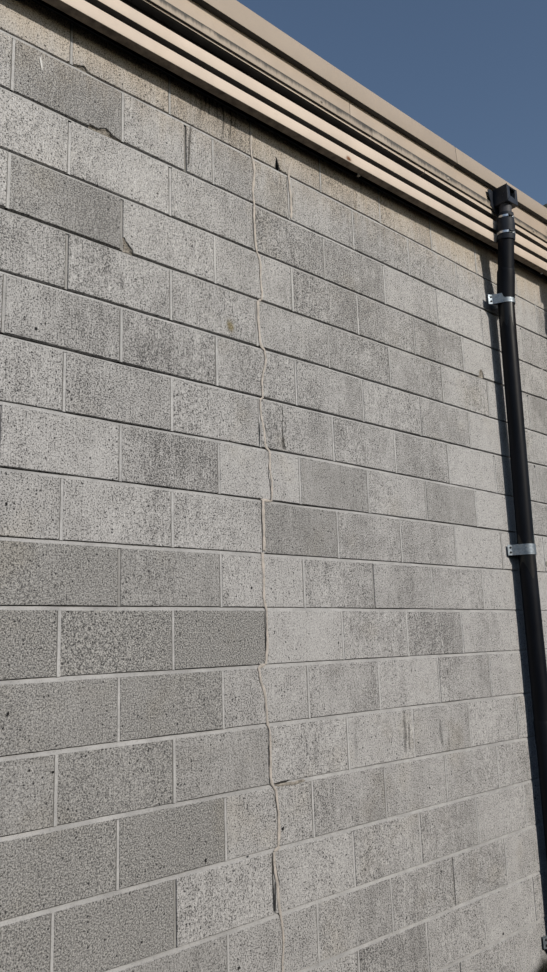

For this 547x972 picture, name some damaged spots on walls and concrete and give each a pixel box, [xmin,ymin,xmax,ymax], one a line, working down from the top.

crack [250,121,286,972]
crack [286,161,294,218]